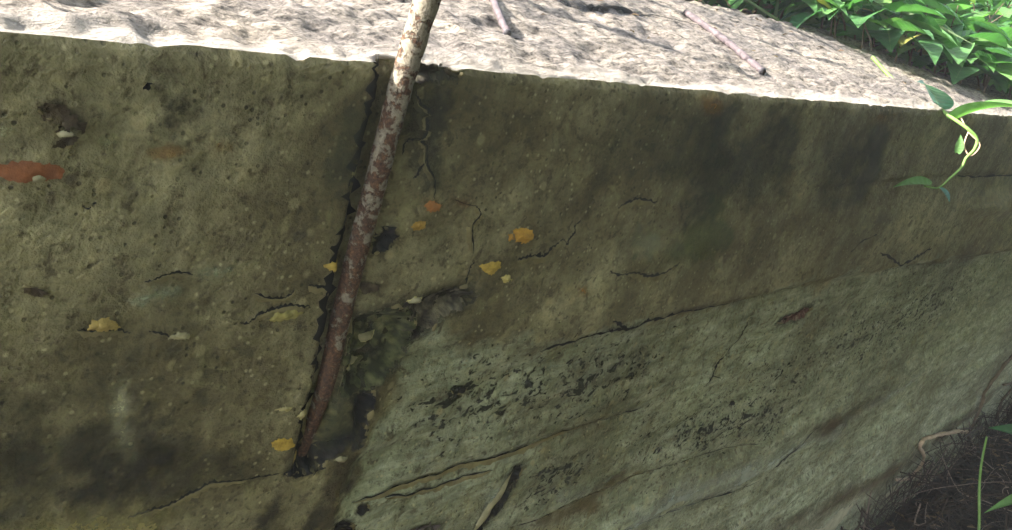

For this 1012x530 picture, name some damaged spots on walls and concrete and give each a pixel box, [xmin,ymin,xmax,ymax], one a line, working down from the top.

crack [402,91,484,284]
crack [145,270,193,286]
crack [240,54,379,454]
crack [851,234,932,271]
crack [540,298,749,386]
crack [127,473,279,519]